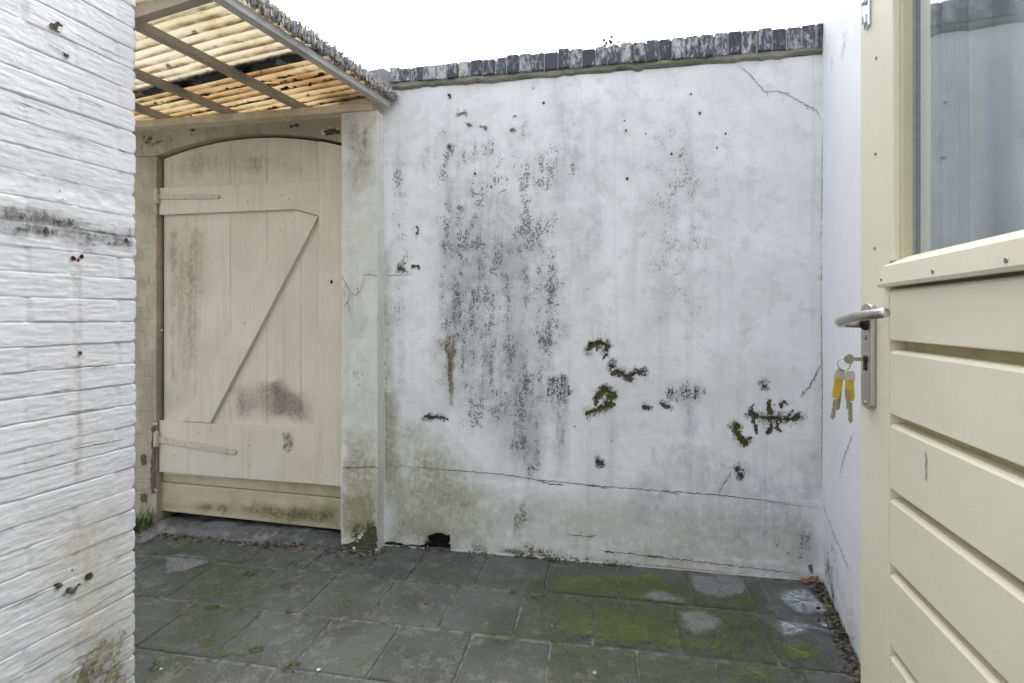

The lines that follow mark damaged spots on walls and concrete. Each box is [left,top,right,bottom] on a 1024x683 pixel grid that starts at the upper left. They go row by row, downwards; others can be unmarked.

spalling [341,526,454,551]
leakage [424,139,571,476]
crack [342,66,853,575]
leakage [665,381,705,402]